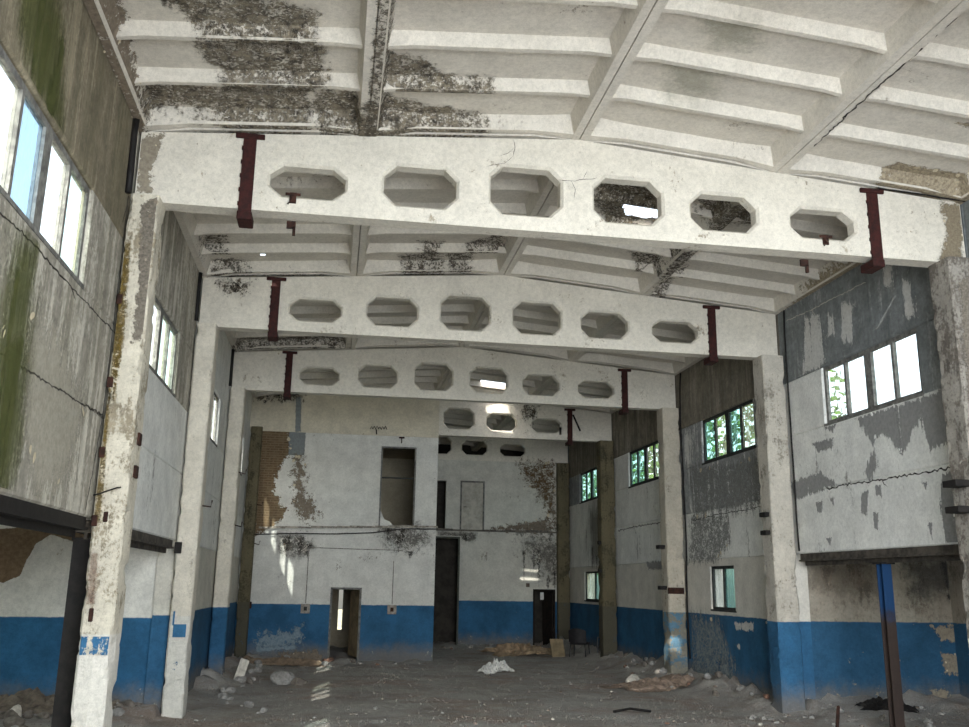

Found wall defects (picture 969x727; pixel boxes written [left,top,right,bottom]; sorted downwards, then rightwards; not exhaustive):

damp [32,0,64,116]
crack [814,18,957,146]
spalling [873,162,969,260]
damp [0,270,24,478]
flaking render [255,431,323,537]
flaking render [486,456,556,535]
flaking render [0,527,84,583]
peeling [691,607,740,679]
peeling [734,621,754,632]